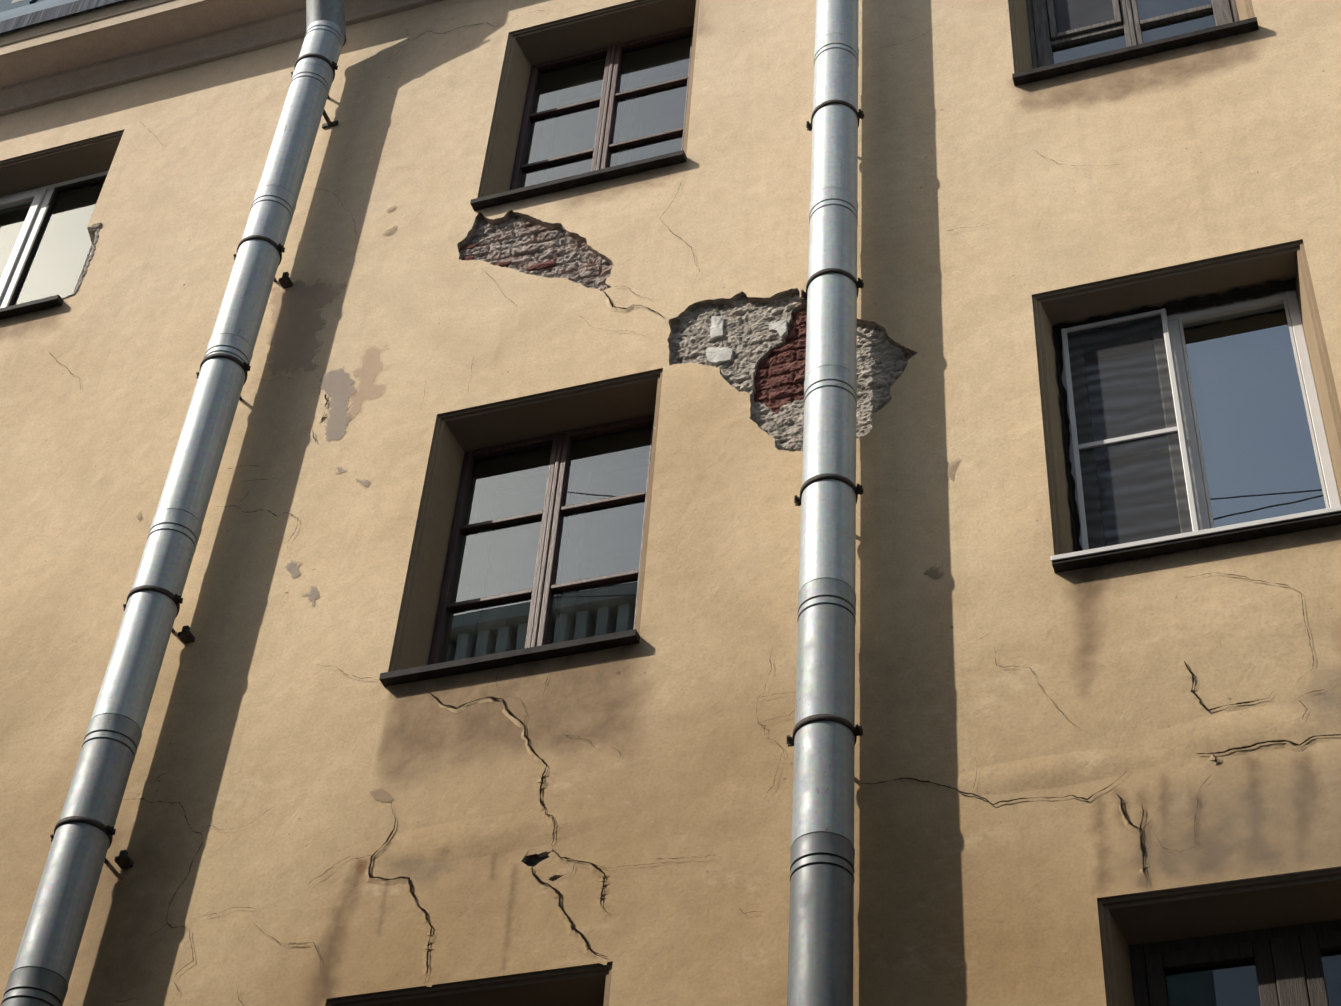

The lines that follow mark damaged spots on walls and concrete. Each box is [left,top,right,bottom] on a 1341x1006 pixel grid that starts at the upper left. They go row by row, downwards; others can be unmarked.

spalling [457,210,613,291]
peeling [320,367,356,441]
crack [579,286,667,338]
spalling [667,288,807,452]
spalling [856,319,918,439]
water stain [465,645,629,741]
crack [861,573,1341,888]
crack [428,669,715,965]
crack [306,801,438,987]